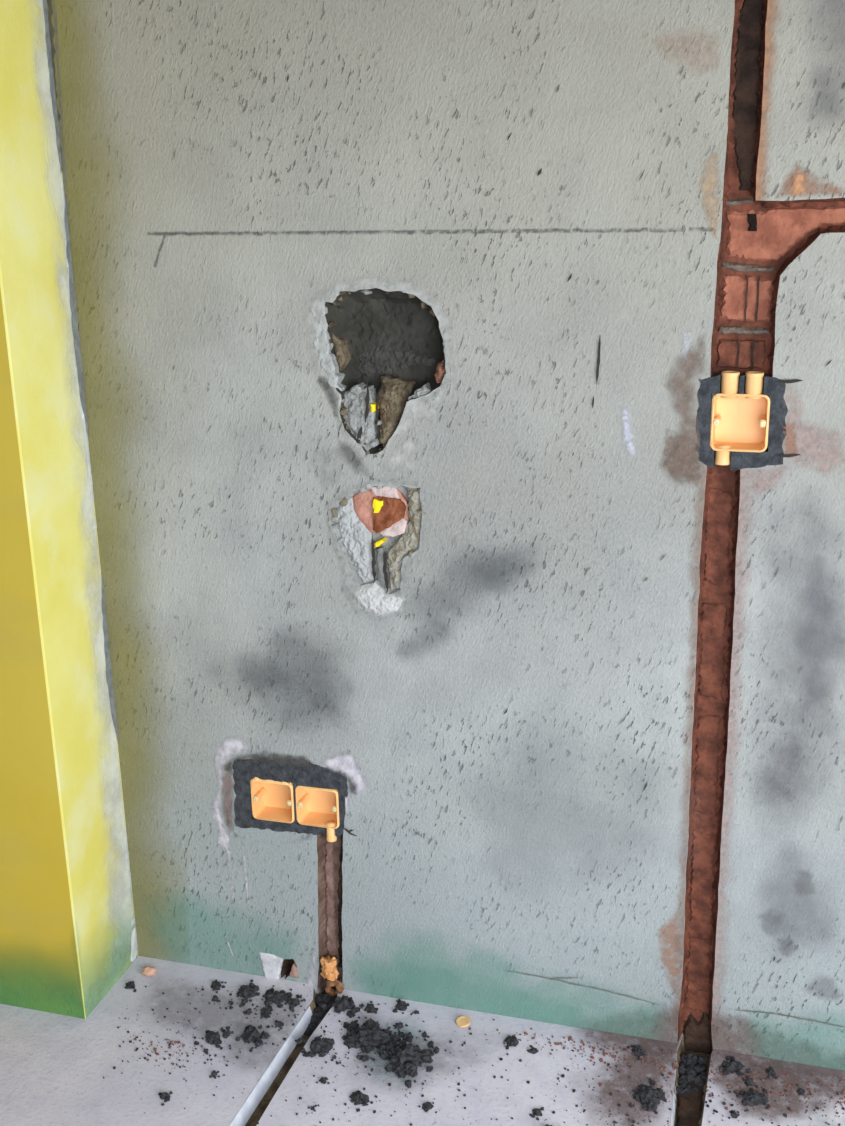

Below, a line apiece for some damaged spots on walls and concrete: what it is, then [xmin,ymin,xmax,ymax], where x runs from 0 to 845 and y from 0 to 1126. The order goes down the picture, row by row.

corrosion [756,0,773,200]
corrosion [784,169,840,194]
spalling [309,281,450,457]
spalling [329,483,426,616]
corrosion [664,352,707,648]
corrosion [711,473,748,1033]